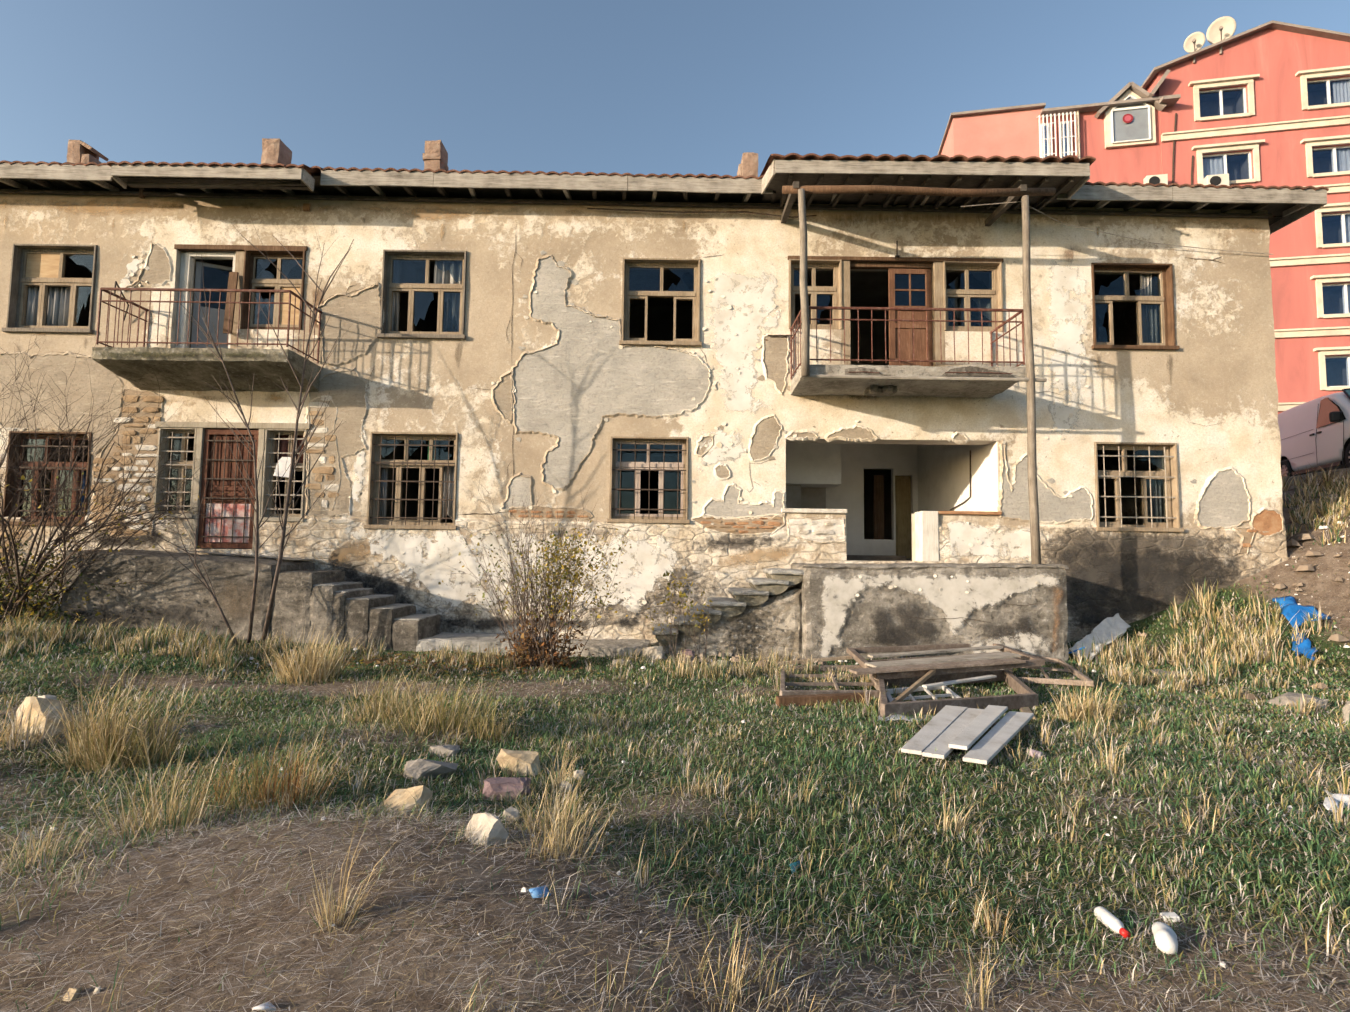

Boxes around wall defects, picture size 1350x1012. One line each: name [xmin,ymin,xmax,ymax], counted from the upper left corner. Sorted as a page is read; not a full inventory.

spalling [845,367,898,396]
spalling [942,366,1015,377]
peeling [1045,262,1090,440]
flaking render [0,351,164,540]
flaking render [303,250,880,613]
flaking render [947,431,970,444]
water stain [871,603,936,646]
peeling [821,440,1095,657]
water stain [1061,544,1239,626]
flaking render [1190,466,1286,556]